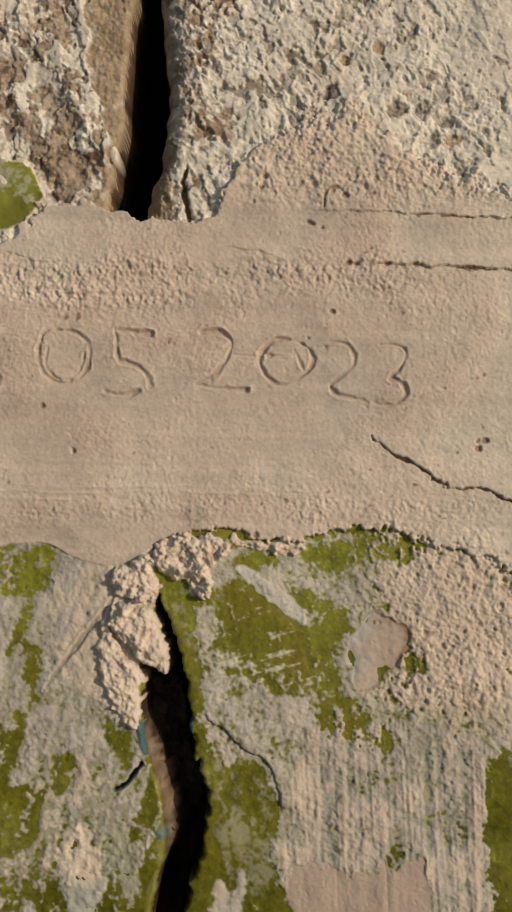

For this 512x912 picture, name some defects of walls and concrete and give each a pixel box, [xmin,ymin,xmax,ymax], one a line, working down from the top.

spalling [0,0,143,233]
crack [110,0,193,223]
spalling [321,82,342,101]
spalling [383,99,433,121]
crack [316,208,512,222]
crack [374,260,512,273]
crack [370,434,512,503]
damp [194,563,319,694]
damp [0,693,157,912]
peeling [142,774,169,912]
crack [111,651,283,912]
flaking render [283,527,512,912]